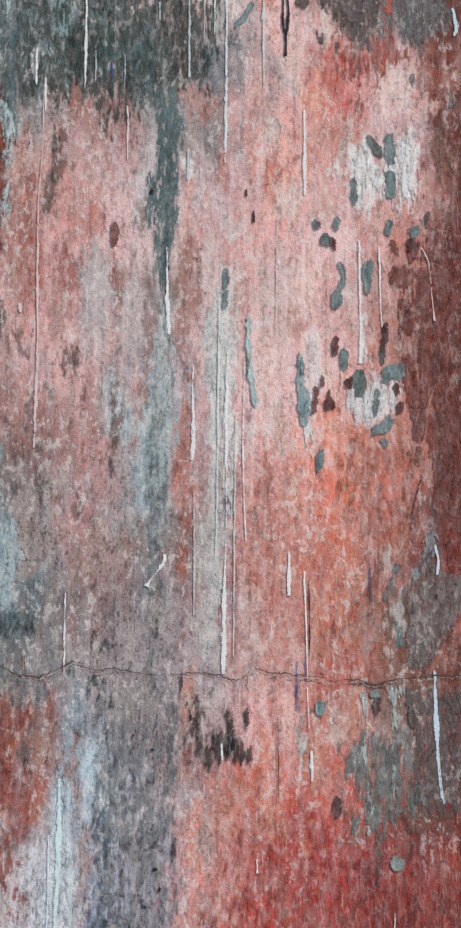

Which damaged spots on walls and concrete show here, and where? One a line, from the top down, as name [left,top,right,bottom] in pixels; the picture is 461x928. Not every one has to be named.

peeling [295,0,385,62]
peeling [395,0,459,49]
peeling [313,216,341,251]
peeling [330,85,461,578]
peeling [296,353,336,426]
peeling [316,449,325,472]
crack [0,581,461,764]